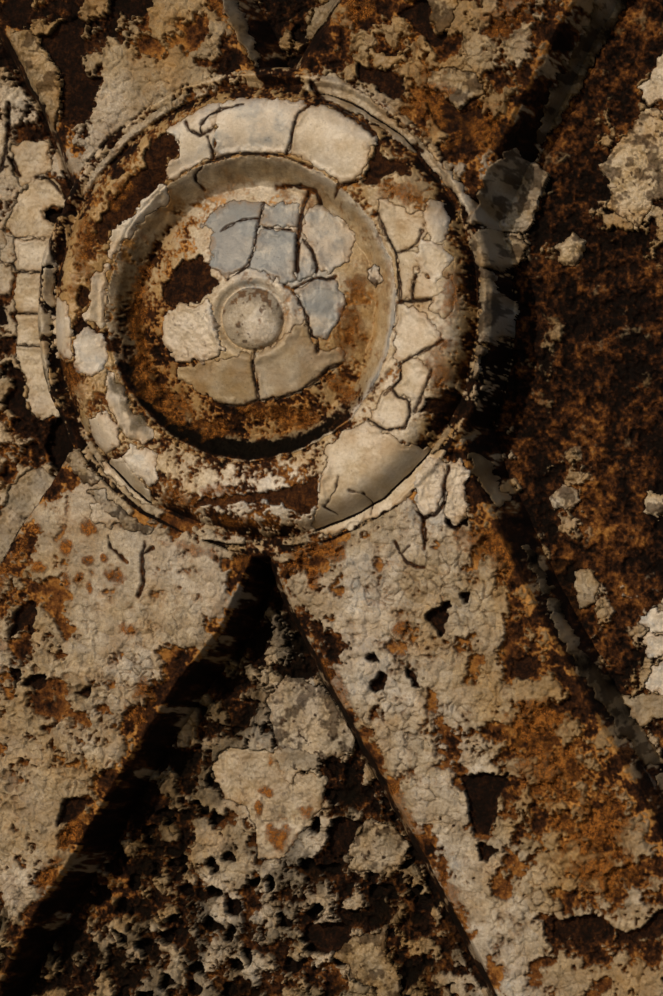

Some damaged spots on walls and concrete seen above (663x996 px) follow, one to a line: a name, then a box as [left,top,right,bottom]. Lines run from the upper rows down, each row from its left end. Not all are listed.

spalling [2,0,104,131]
peeling [599,54,663,232]
corrosion [129,265,228,438]
peeling [0,47,551,565]
crack [186,84,374,407]
crack [380,218,429,303]
crack [372,342,440,430]
crack [397,477,447,568]
corrosion [454,530,513,576]
corrosion [254,787,291,852]
peeling [212,675,356,860]
corrosion [502,700,641,896]